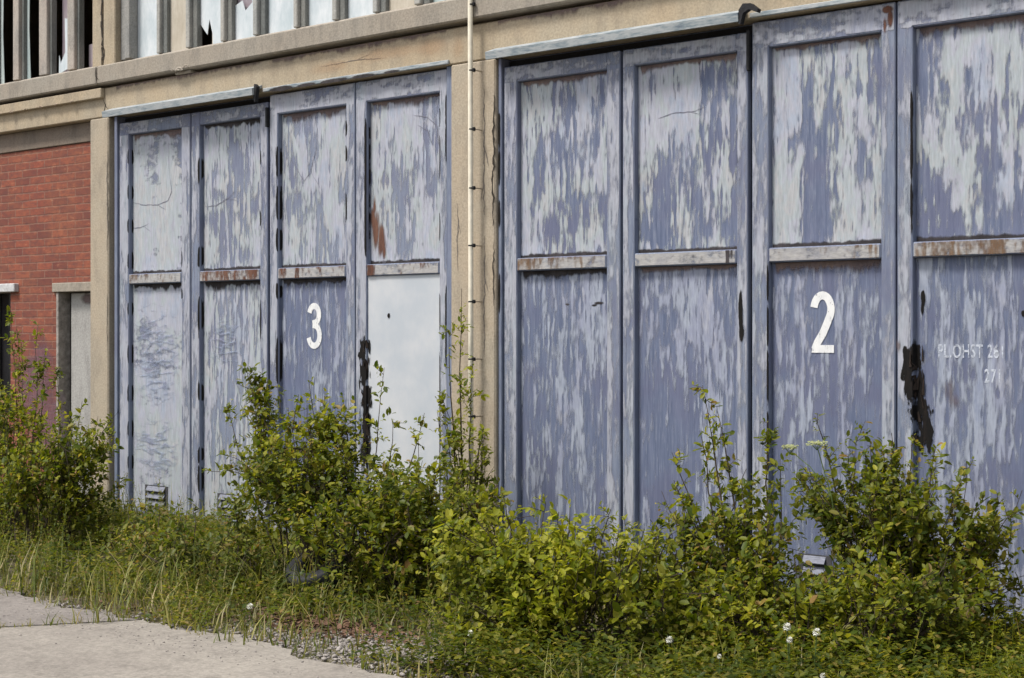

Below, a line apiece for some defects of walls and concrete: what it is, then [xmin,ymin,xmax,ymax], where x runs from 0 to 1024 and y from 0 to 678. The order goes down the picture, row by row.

peeling [120,70,447,530]
rust [371,201,386,258]
crack [456,92,495,355]
peeling [505,0,1024,613]
rust [916,239,1024,256]